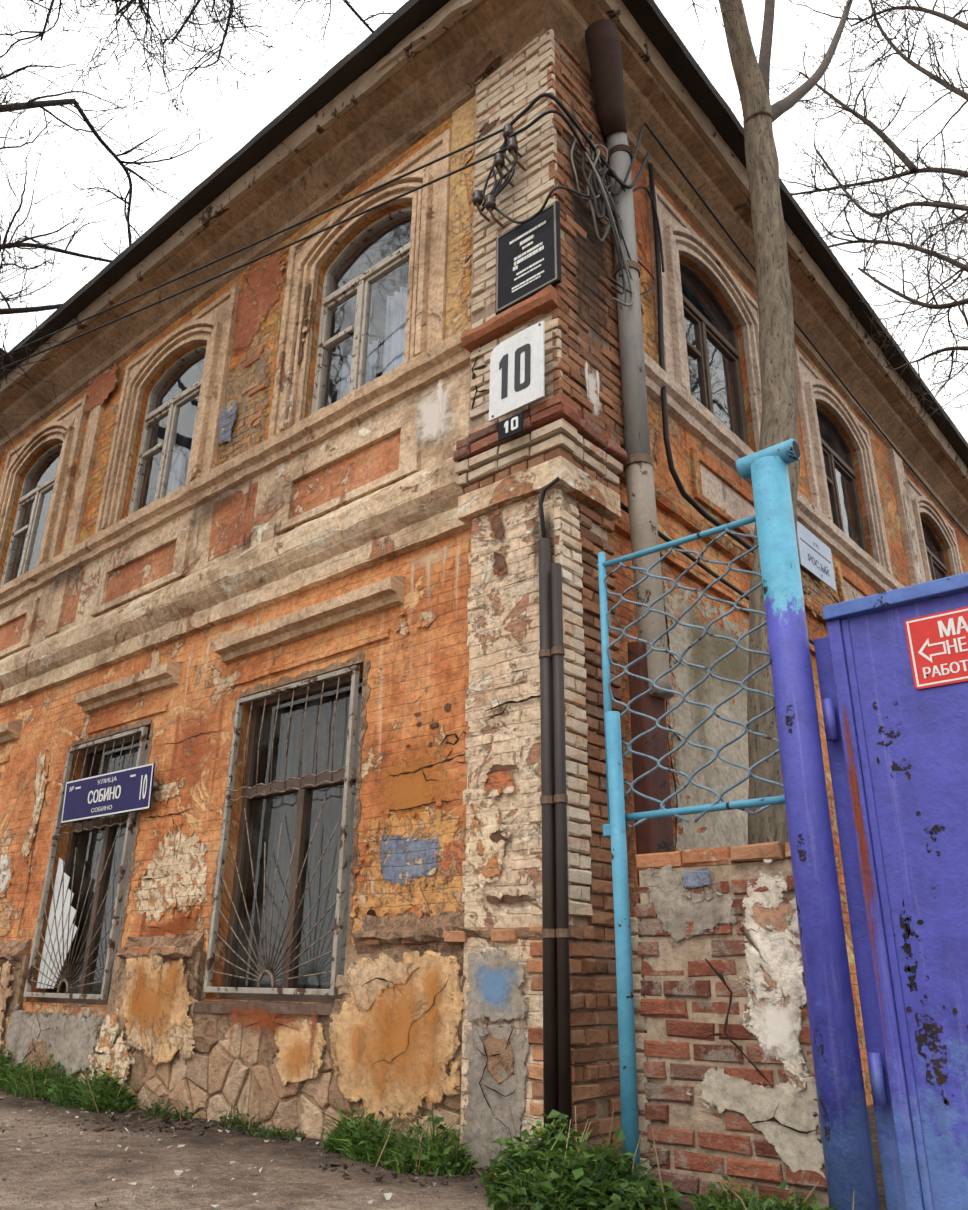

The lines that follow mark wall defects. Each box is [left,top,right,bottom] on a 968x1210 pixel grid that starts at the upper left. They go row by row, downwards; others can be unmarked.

spalling [487,510,507,576]
spalling [800,567,840,629]
crack [379,695,540,813]
peeling [0,748,48,937]
peeling [134,819,209,923]
peeling [350,764,536,919]
crack [361,977,449,1066]
crack [702,958,820,1134]